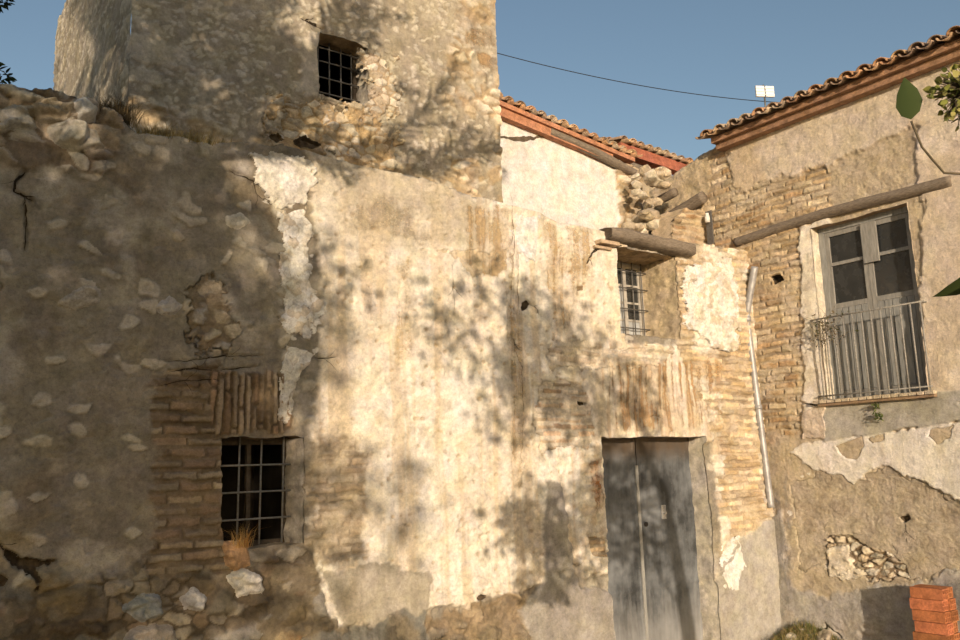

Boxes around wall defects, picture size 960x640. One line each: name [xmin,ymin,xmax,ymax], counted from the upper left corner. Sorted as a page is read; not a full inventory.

crack [4,173,35,249]
spalling [248,43,406,424]
flaking render [680,256,742,352]
flaking render [923,425,954,444]
flaking render [787,465,960,582]